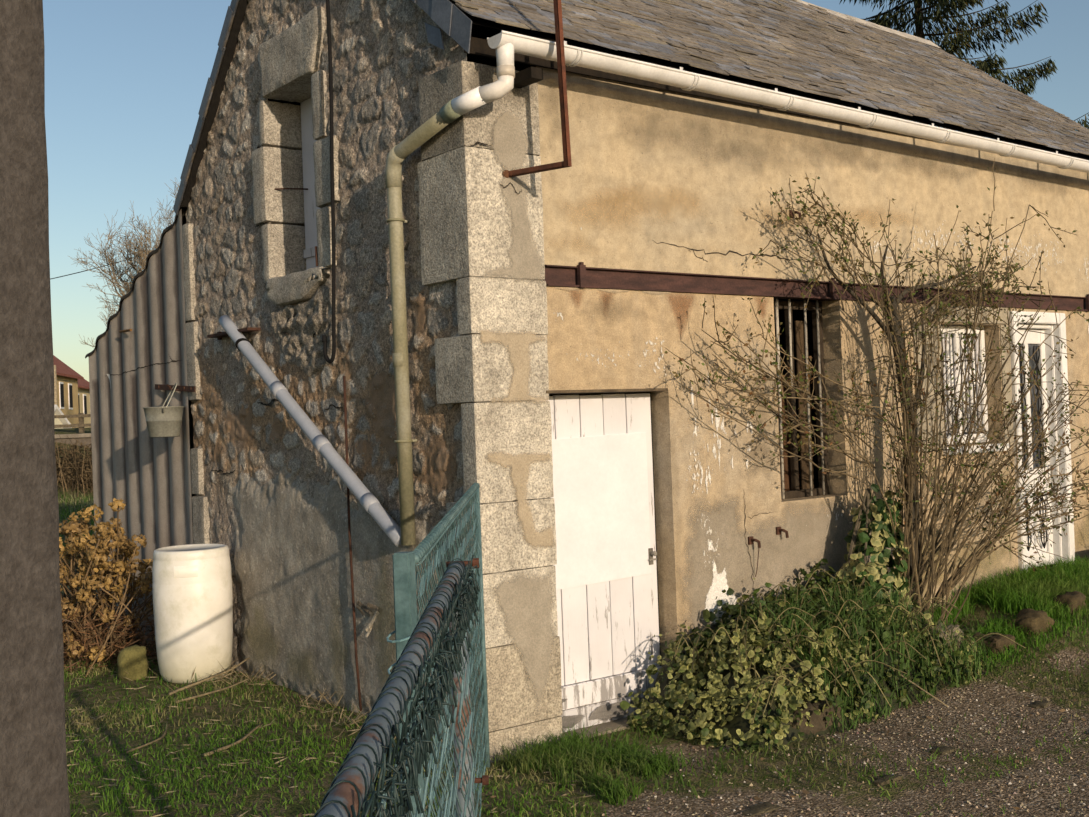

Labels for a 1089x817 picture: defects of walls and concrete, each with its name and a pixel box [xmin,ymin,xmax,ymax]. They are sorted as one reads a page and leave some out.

crack [653,240,1003,266]
crack [111,356,182,375]
peeling [699,408,753,493]
peeling [702,539,737,624]